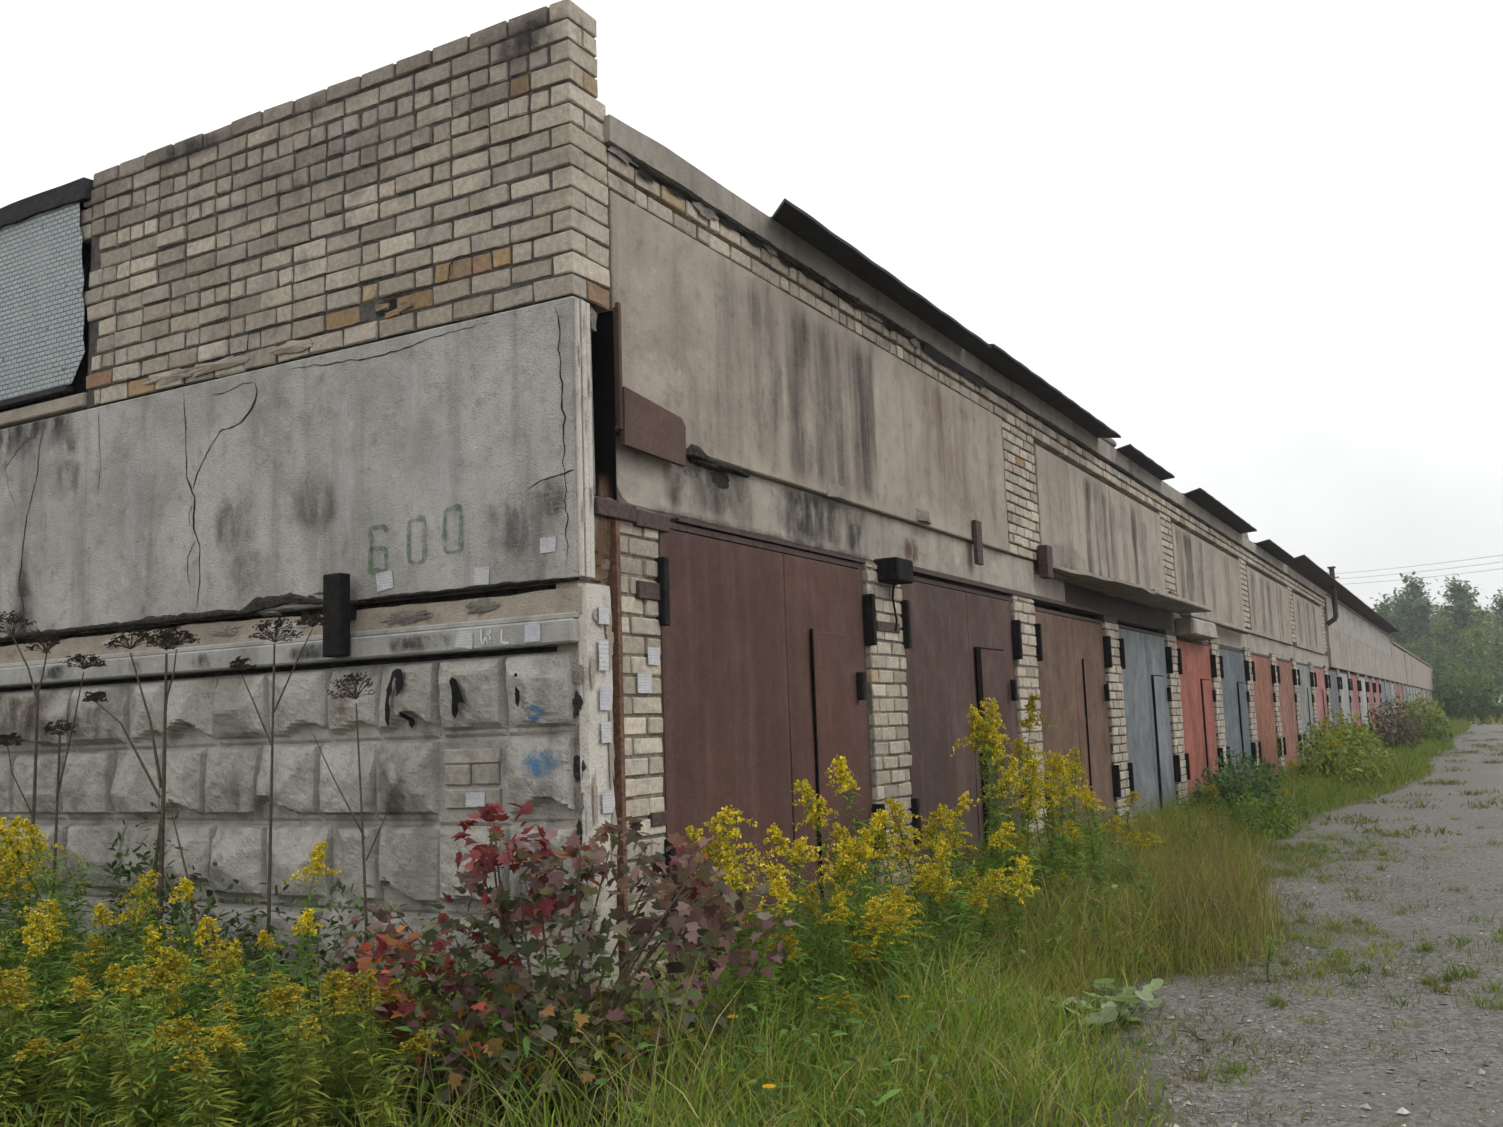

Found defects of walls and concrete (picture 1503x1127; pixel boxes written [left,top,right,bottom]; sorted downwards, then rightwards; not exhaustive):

leakage [0,416,63,445]
crack [184,322,490,612]
crack [527,308,574,562]
leakage [750,491,867,560]
leakage [853,353,870,489]